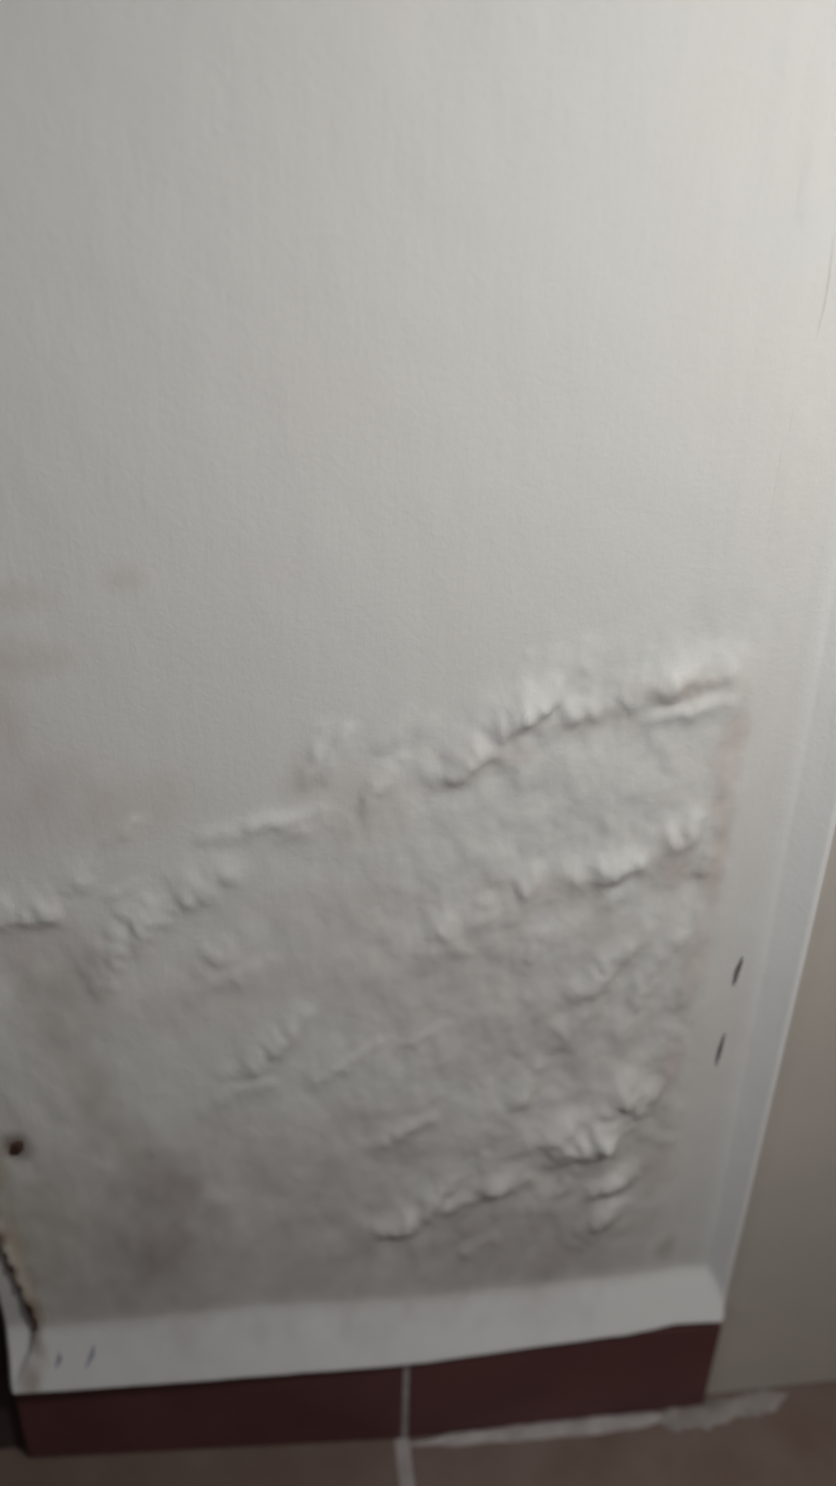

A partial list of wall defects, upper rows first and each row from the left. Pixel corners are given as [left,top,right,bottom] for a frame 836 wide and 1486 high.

corrosion [9,1141,24,1156]
corrosion [0,1236,38,1331]